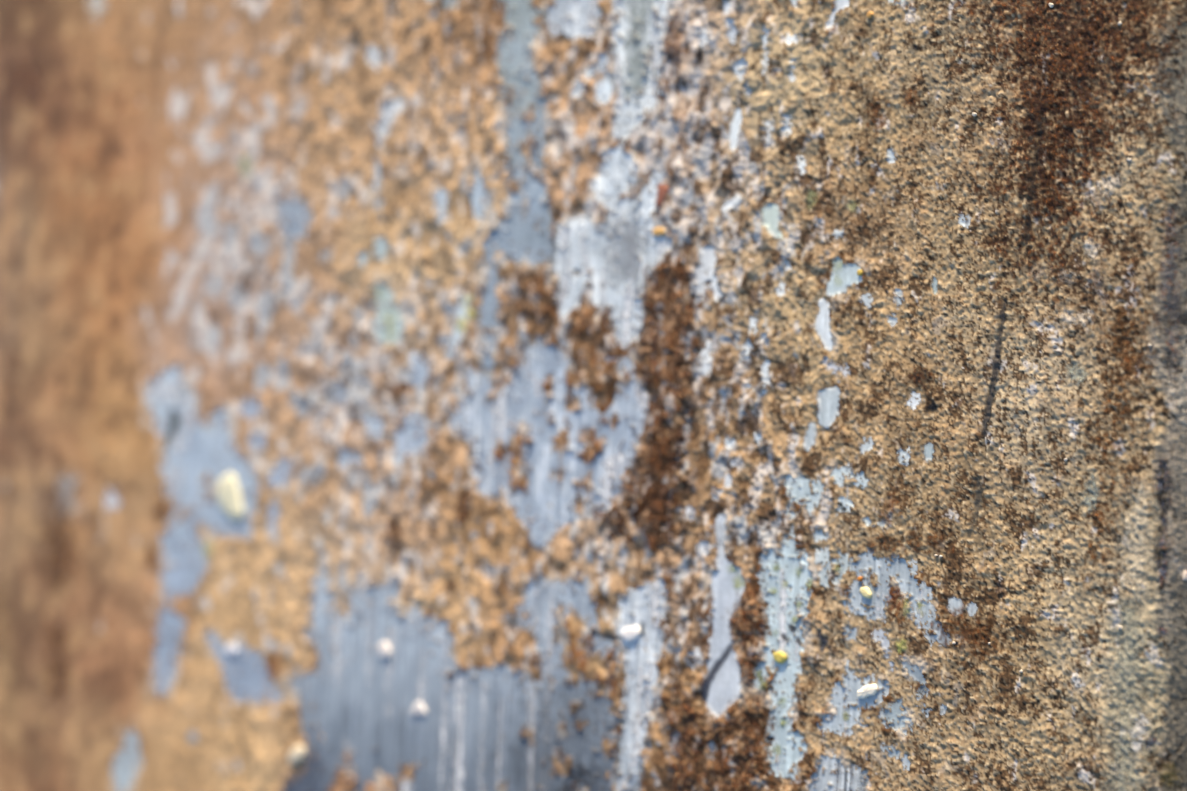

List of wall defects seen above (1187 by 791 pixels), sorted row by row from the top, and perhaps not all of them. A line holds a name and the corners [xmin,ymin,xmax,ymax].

peeling [826,0,849,29]
peeling [446,0,676,552]
peeling [692,246,723,331]
peeling [728,108,742,152]
peeling [762,203,783,239]
peeling [803,257,863,451]
peeling [907,392,937,412]
corrosion [932,0,1187,304]
damp [1168,291,1187,444]
peeling [144,363,294,696]
peeling [279,563,669,791]
peeling [704,470,978,791]